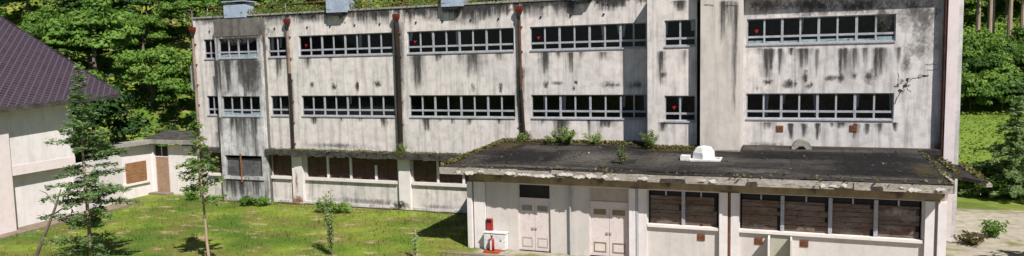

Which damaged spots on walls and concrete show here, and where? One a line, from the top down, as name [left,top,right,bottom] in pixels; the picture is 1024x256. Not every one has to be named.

leakage [214,60,259,88]
leakage [271,0,575,79]
leakage [764,48,812,88]
leakage [874,48,900,69]
crack [894,64,938,104]
peeling [505,171,619,180]